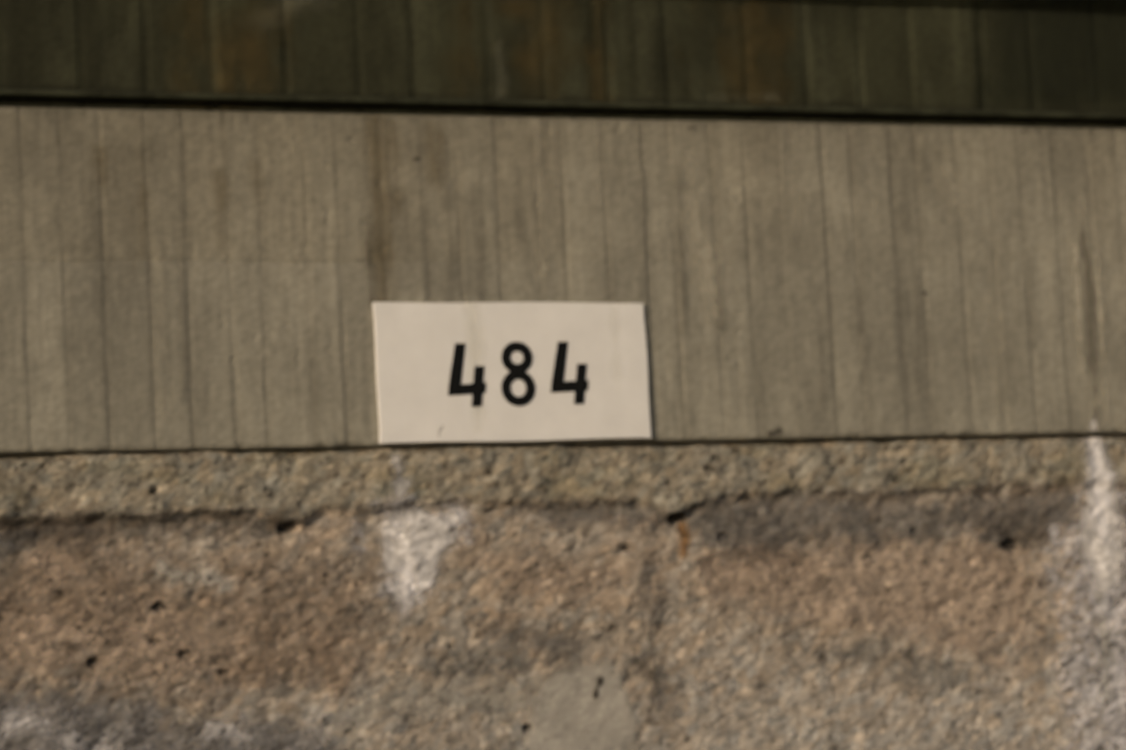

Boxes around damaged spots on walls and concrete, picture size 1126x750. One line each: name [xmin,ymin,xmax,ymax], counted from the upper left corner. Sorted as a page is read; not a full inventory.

damp [694,420,1126,750]